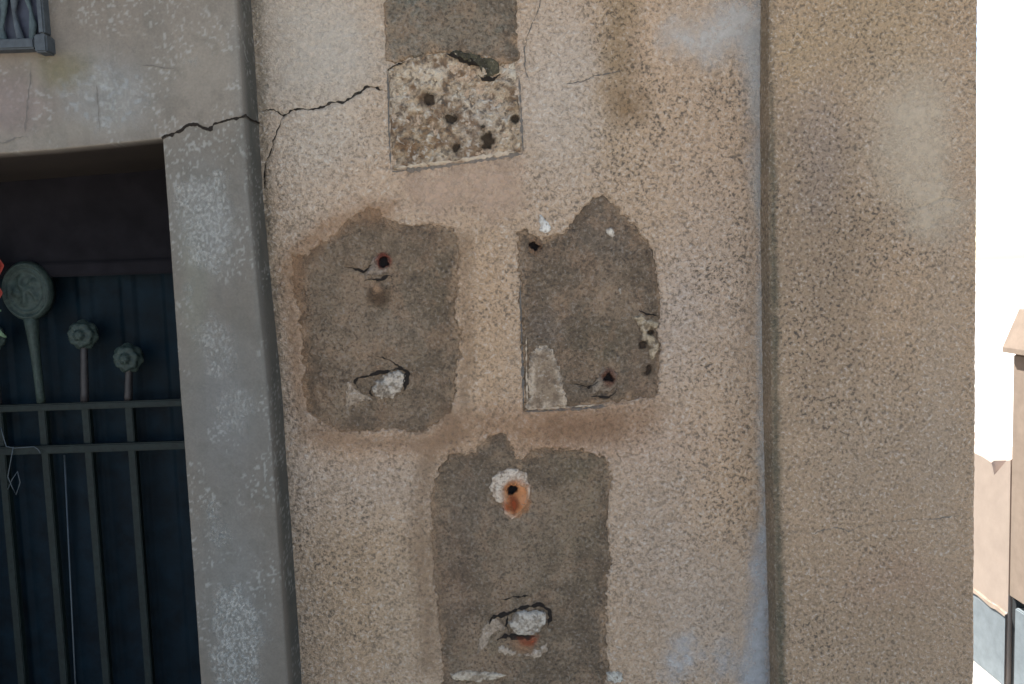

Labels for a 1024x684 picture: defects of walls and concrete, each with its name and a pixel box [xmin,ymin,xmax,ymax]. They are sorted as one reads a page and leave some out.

crack [162,85,380,189]
flaking render [383,0,521,170]
peeling [290,207,463,433]
peeling [516,195,661,412]
corrosion [505,482,527,515]
peeling [430,433,613,684]